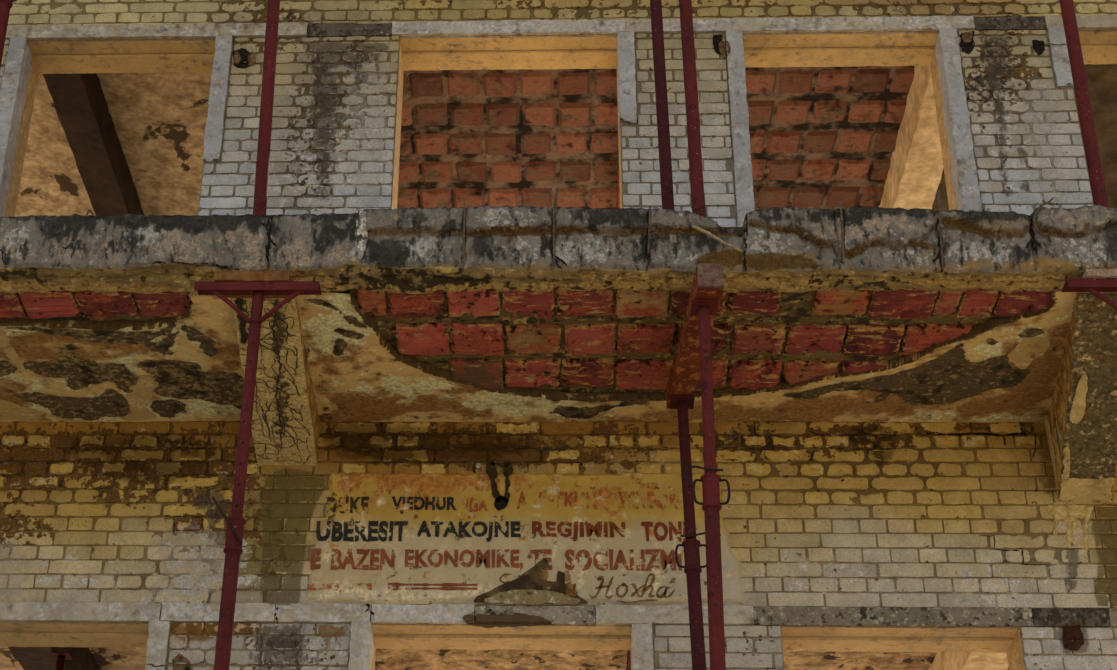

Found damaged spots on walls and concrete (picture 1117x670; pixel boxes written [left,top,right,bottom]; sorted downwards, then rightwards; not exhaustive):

damp [35,215,80,255]
damp [117,213,237,236]
crack [741,214,749,271]
crack [839,208,847,264]
crack [934,211,945,272]
crack [1026,211,1042,255]
spalling [0,290,244,421]
spalling [307,288,690,419]
spalling [695,288,1057,405]
peeling [2,435,51,448]
peeling [29,435,205,486]
peeling [157,477,233,530]